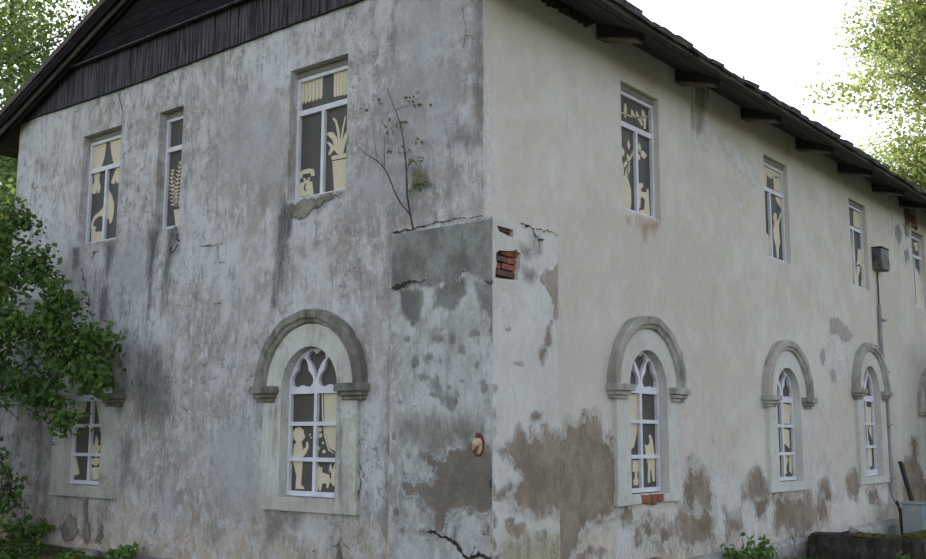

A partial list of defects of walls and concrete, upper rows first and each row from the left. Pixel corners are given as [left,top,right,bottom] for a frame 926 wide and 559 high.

spalling [287,193,341,219]
damp [106,231,157,306]
damp [164,228,176,281]
crack [390,279,424,290]
spalling [495,251,518,279]
peeling [539,262,559,362]
peeling [412,353,463,410]
peeling [394,406,833,559]
peeling [846,468,881,505]
peeling [901,435,926,502]
spalling [58,499,103,544]
crack [427,530,491,559]